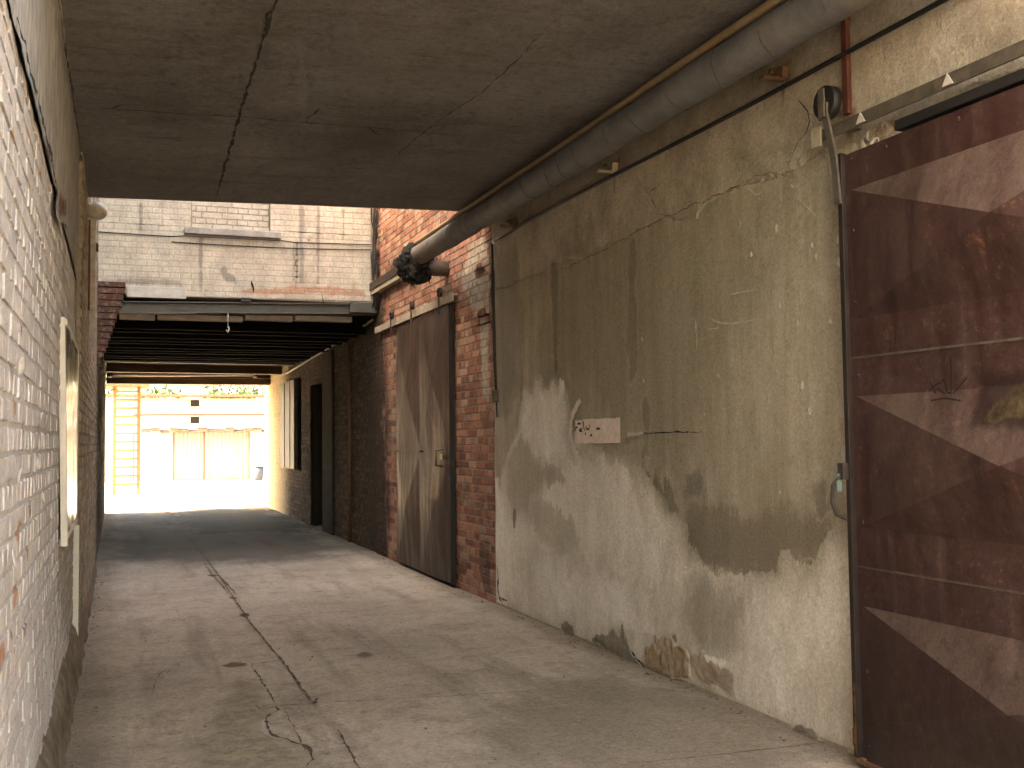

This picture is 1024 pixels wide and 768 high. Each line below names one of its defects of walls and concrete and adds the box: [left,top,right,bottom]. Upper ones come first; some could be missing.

crack [58,0,546,200]
crack [791,100,815,158]
damp [443,153,854,768]
crack [627,430,698,438]
crack [162,507,491,748]
spalling [561,620,575,637]
spalling [592,623,737,700]
crack [337,729,360,768]